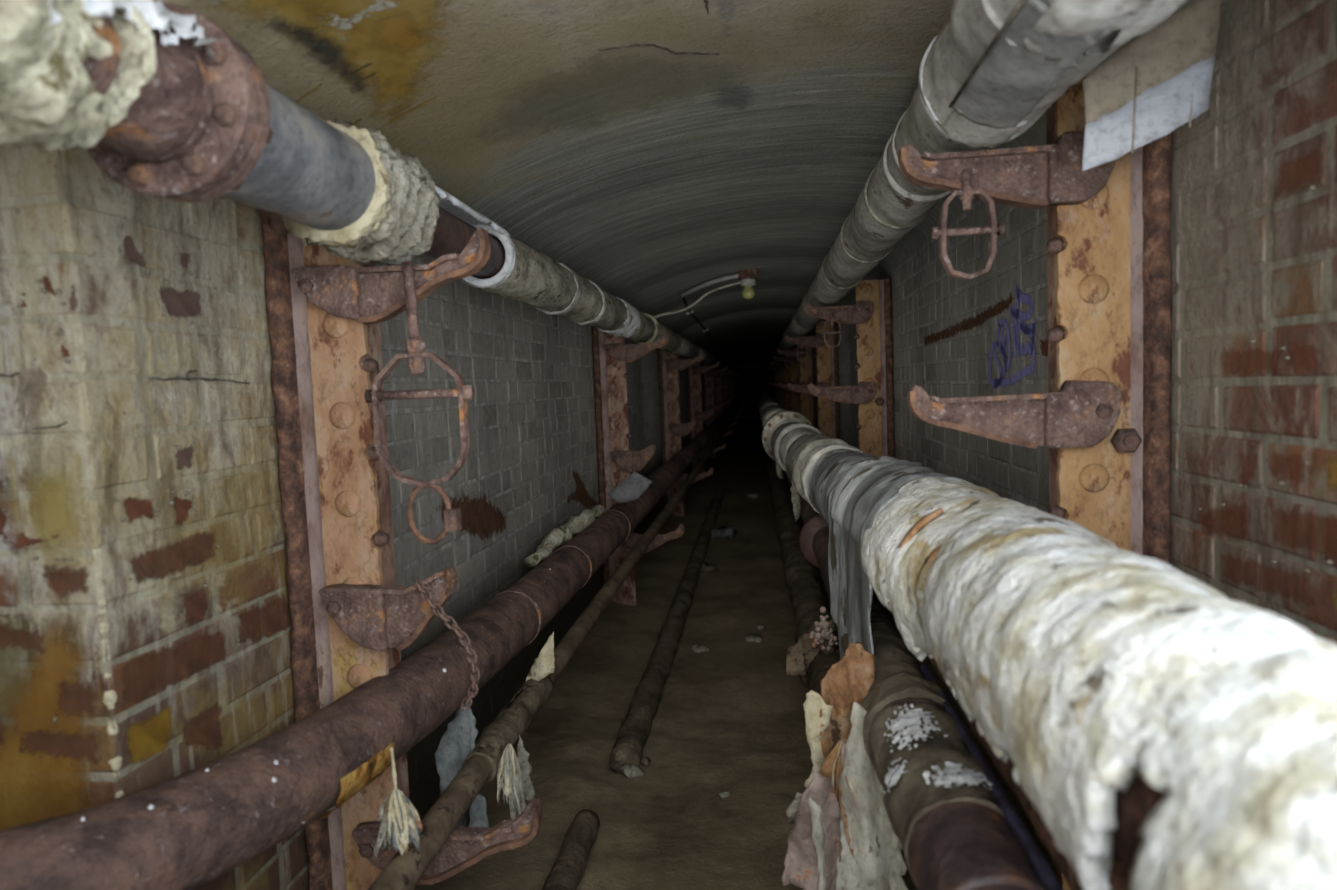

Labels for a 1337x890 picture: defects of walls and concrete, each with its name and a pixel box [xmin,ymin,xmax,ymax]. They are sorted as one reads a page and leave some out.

damp [209,0,441,128]
crack [600,44,719,55]
peeling [118,236,206,324]
peeling [173,438,198,475]
peeling [0,508,88,596]
peeling [0,618,48,654]
damp [97,599,119,735]
peeling [114,490,288,703]
peeling [19,681,99,763]
peeling [184,703,222,749]
damp [108,756,124,798]
rust [320,743,394,819]